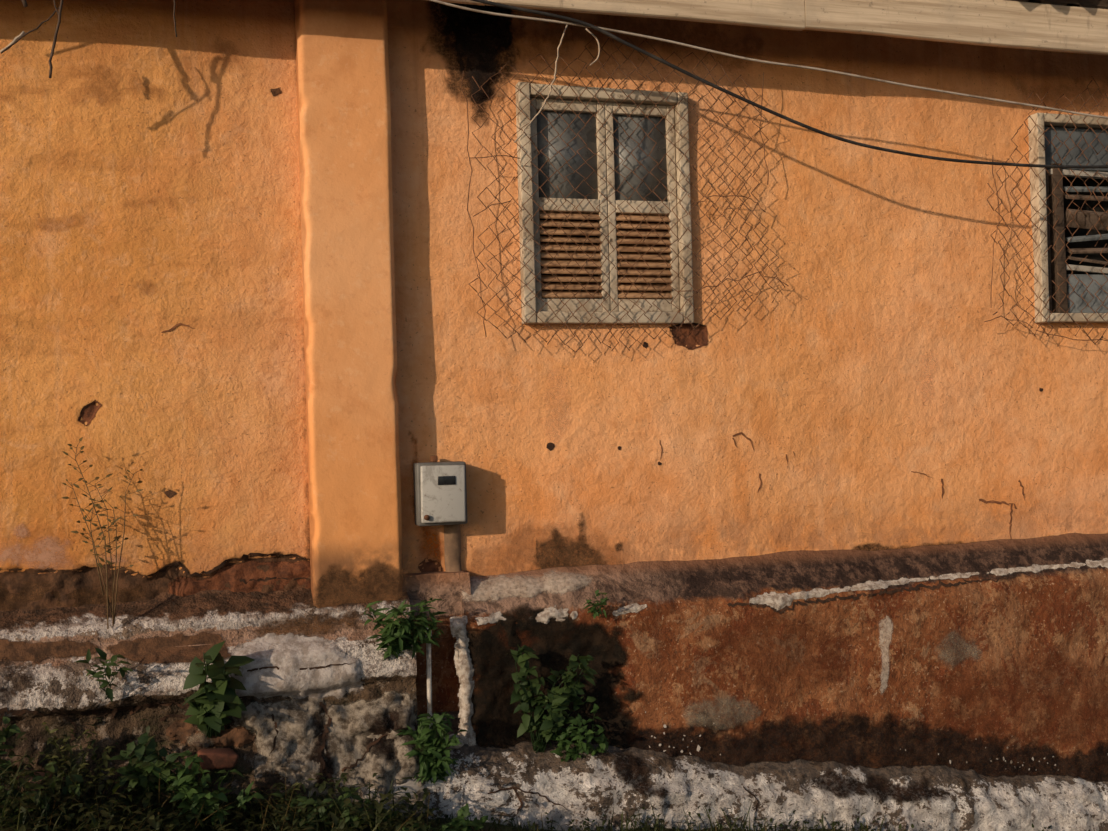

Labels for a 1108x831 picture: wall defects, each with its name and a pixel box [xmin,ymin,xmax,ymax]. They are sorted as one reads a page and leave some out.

damp [493,7,513,50]
flaking render [669,323,708,350]
flaking render [0,552,311,611]
damp [462,521,605,601]
damp [0,659,29,703]
crack [235,662,356,676]
crack [231,691,430,821]
damp [619,711,1108,782]